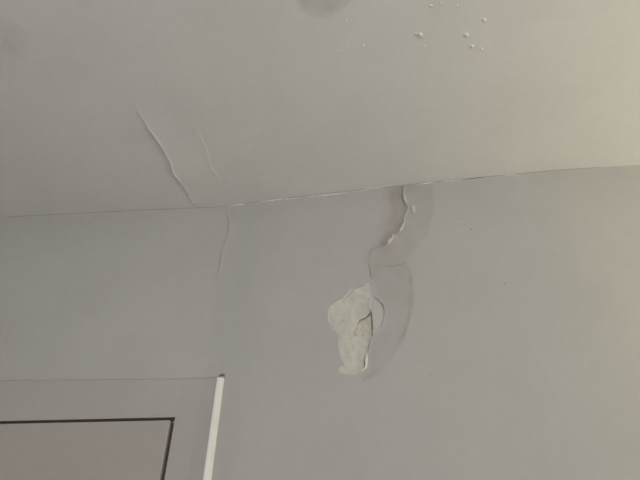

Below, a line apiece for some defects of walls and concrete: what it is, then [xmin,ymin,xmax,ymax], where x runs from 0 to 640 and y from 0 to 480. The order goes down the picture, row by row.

crack [132,103,598,208]
flaking render [328,186,420,375]